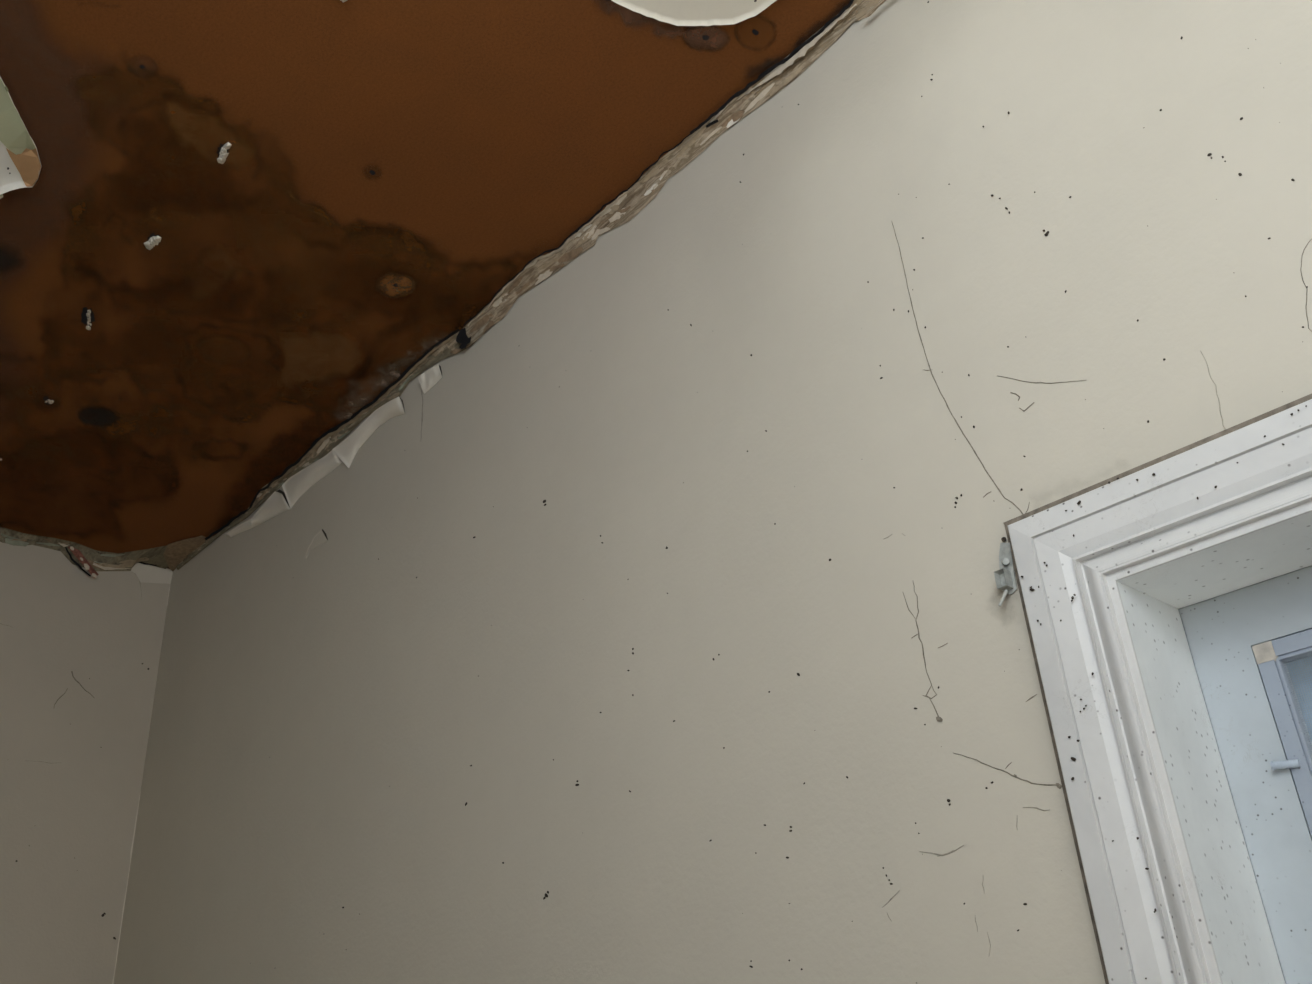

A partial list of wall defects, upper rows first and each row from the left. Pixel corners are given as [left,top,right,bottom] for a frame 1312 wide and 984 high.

peeling [612,0,777,26]
peeling [0,77,42,199]
leakage [0,0,517,538]
crack [892,223,1030,515]
crack [903,582,947,722]
crack [954,753,1062,830]